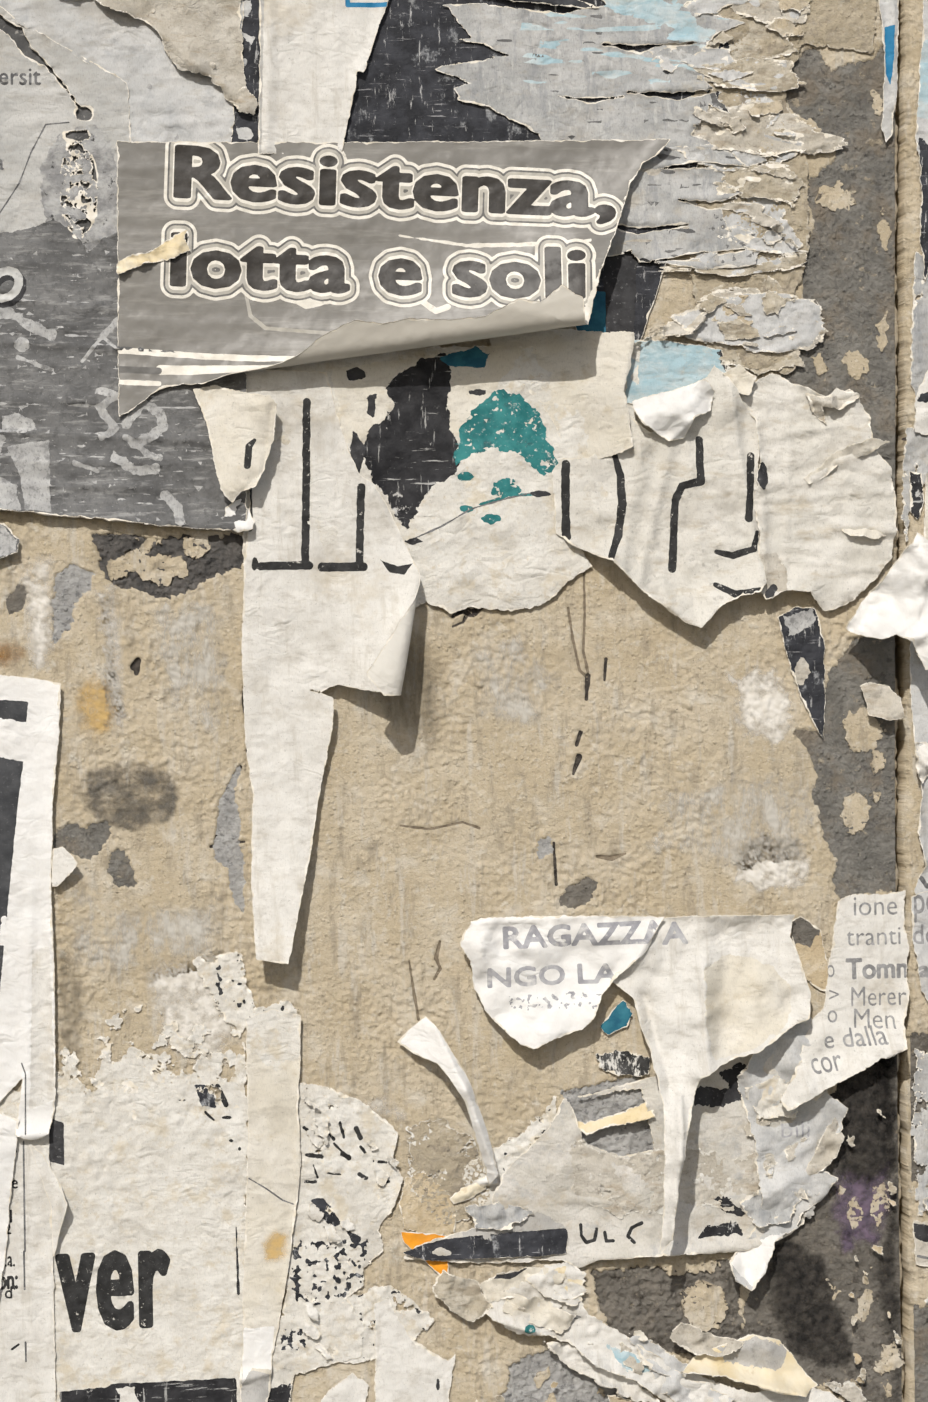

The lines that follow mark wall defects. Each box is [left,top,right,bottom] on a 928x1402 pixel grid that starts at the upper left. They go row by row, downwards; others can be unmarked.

spalling [686,0,895,491]
spalling [51,532,244,644]
leakage [88,771,177,828]
spalling [213,766,247,913]
spalling [560,1076,654,1156]
spalling [590,1032,928,1402]
spalling [502,1349,650,1402]